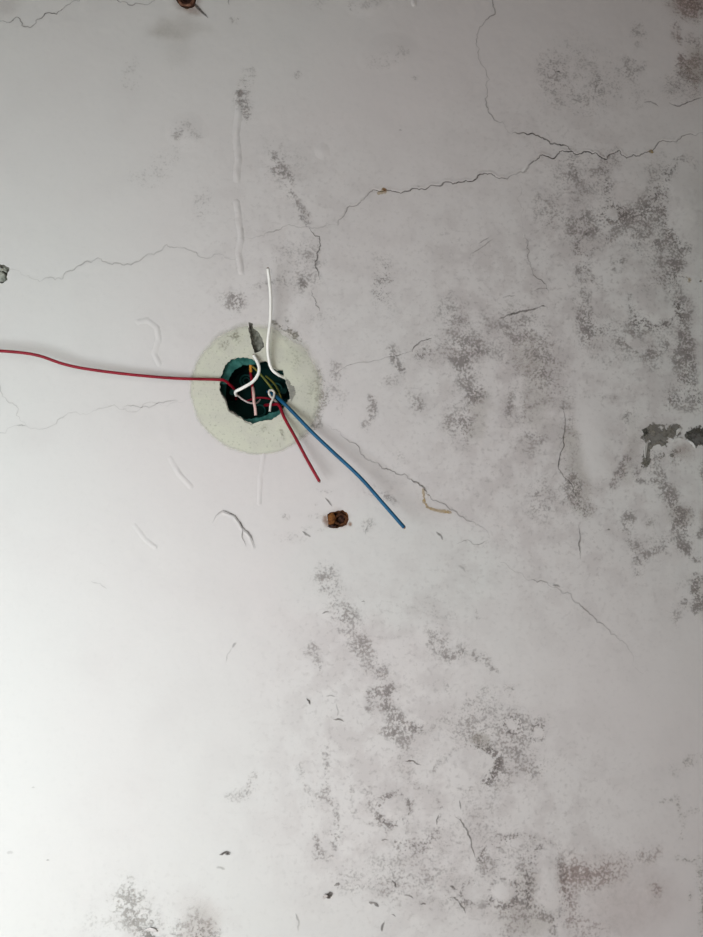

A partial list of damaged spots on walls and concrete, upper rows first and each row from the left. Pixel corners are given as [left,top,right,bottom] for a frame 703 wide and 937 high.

crack [335,129,703,224]
spalling [0,264,9,283]
peeling [641,424,703,468]
crack [213,512,254,549]
rust [326,512,337,528]